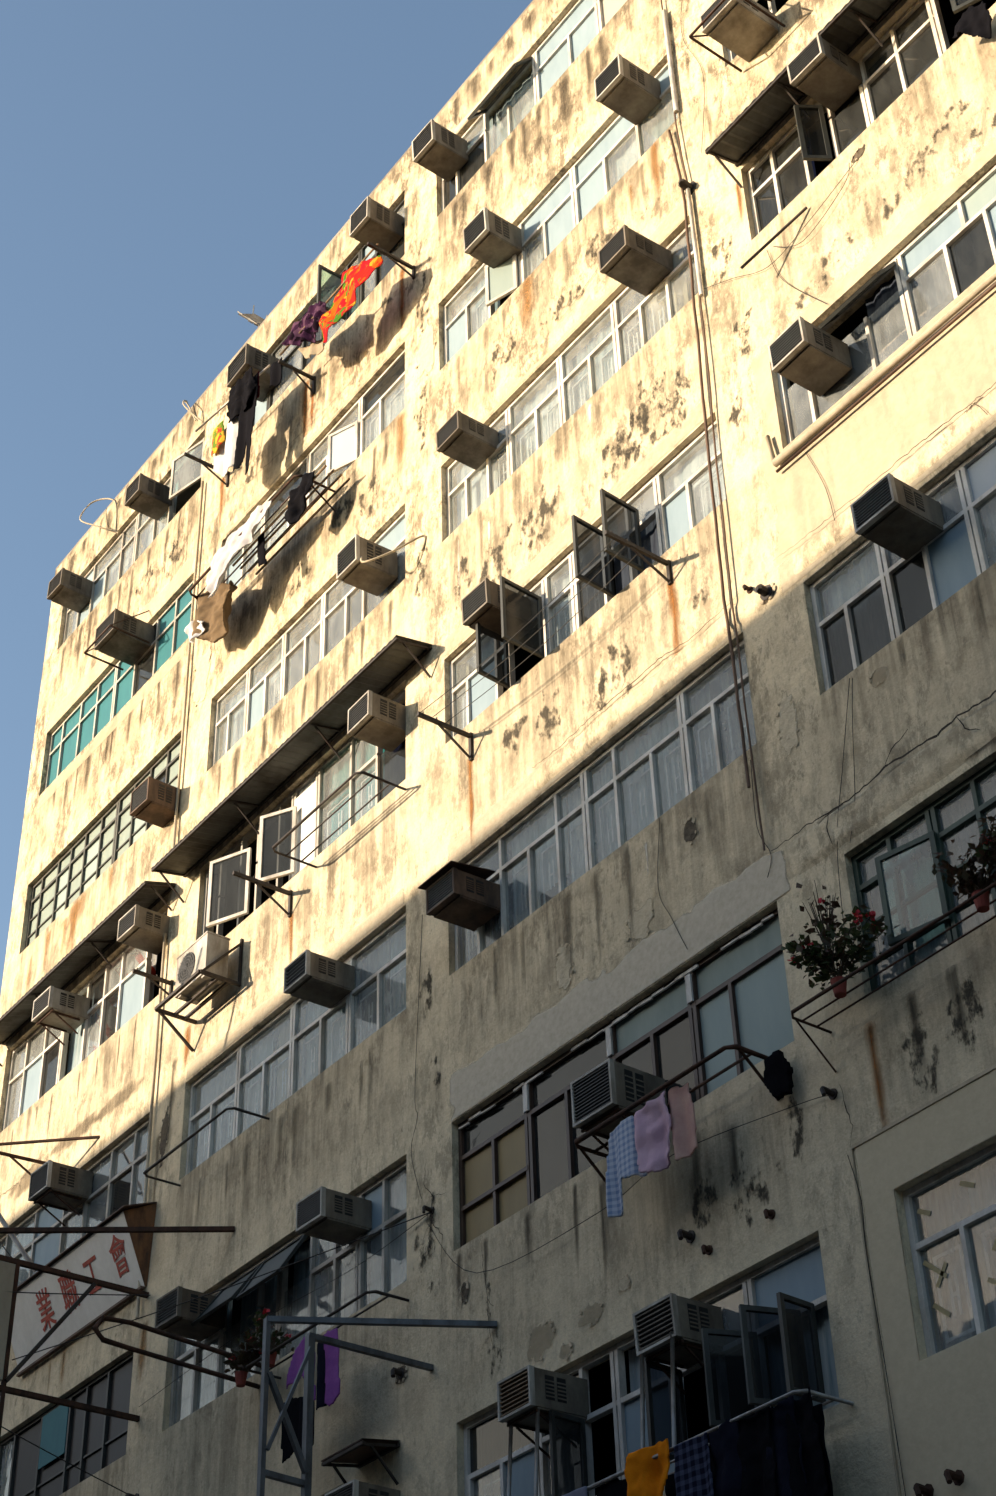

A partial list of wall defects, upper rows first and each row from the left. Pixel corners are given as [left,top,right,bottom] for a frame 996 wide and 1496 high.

leakage [711,239,731,282]
leakage [602,370,690,478]
leakage [729,397,741,426]
leakage [448,484,559,609]
rust [668,584,677,643]
crack [771,690,996,851]
rust [869,1026,882,1111]